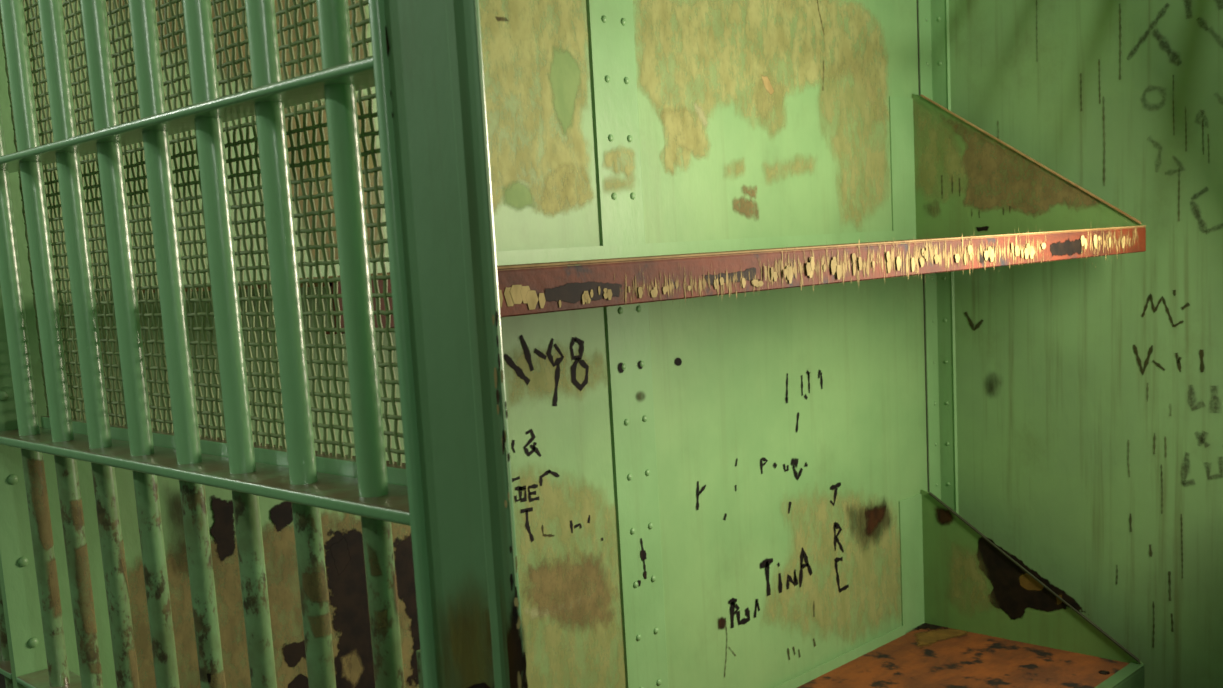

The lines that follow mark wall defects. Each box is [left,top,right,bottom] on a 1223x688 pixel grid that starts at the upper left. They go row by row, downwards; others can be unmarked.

peeling [479,0,593,214]
peeling [492,226,1139,462]
rust [27,459,62,616]
rust [75,543,97,633]
rust [302,571,332,638]
rust [368,549,399,628]
peeling [936,508,953,525]
peeling [951,537,1085,620]